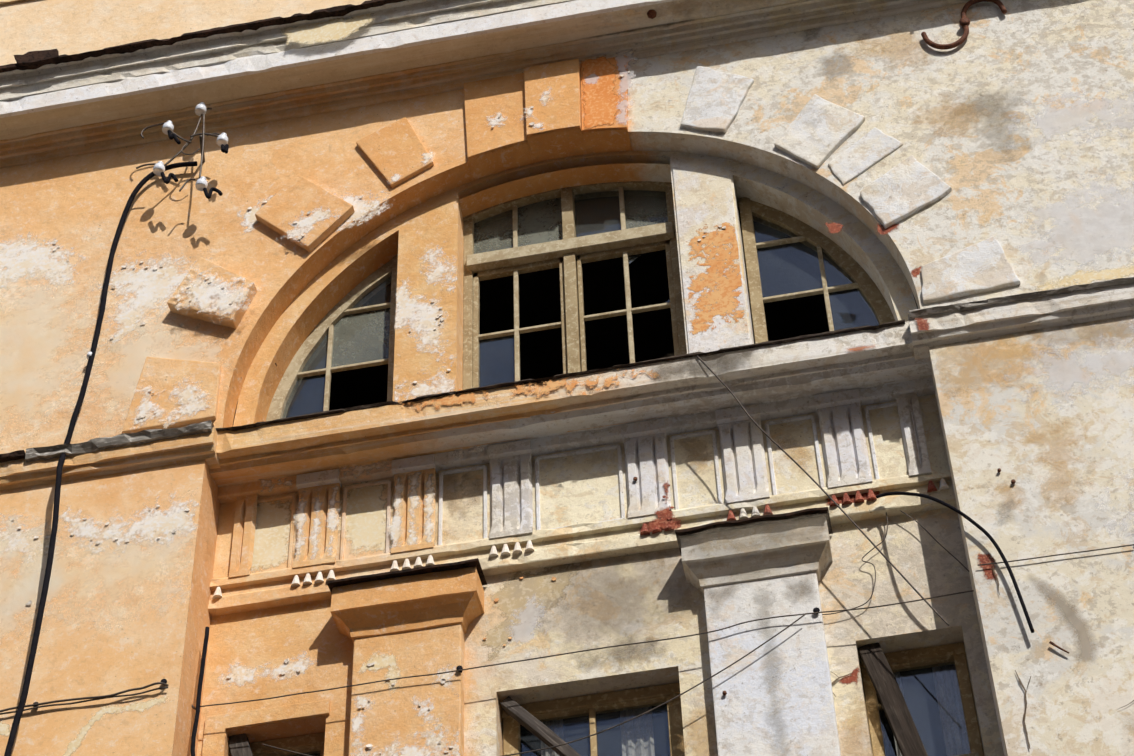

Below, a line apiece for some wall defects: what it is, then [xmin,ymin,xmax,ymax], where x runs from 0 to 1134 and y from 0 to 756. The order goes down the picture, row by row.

peeling [0,235,86,290]
peeling [685,217,747,335]
peeling [394,247,457,401]
flaking render [640,483,681,532]
peeling [0,496,198,634]
flaking render [978,553,998,580]
peeling [219,653,314,686]
peeling [360,653,400,690]
peeling [437,665,455,686]
peeling [352,696,460,756]